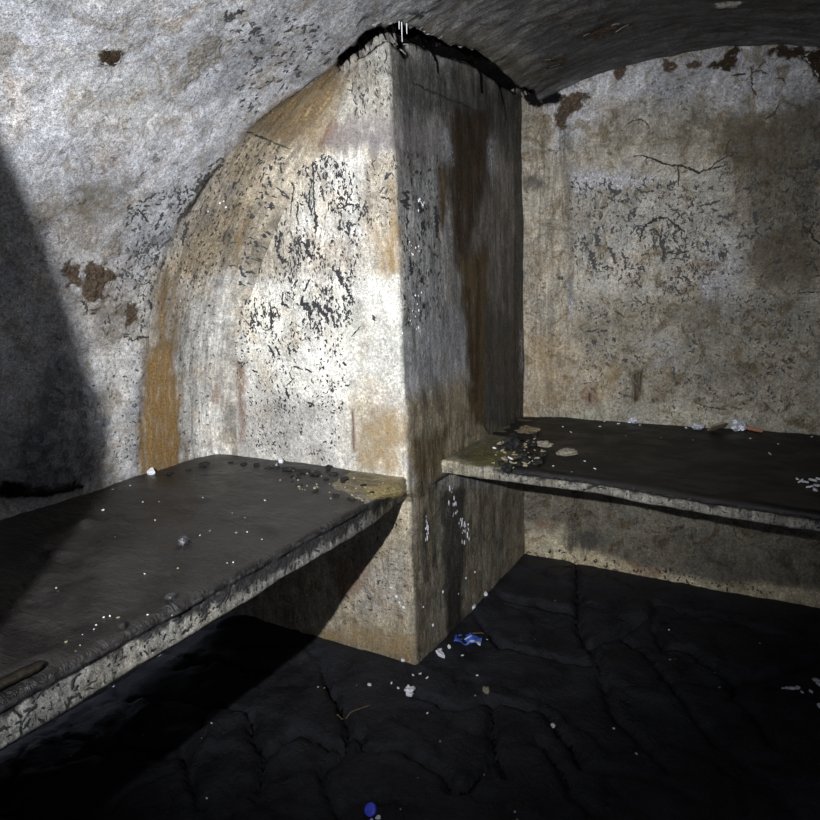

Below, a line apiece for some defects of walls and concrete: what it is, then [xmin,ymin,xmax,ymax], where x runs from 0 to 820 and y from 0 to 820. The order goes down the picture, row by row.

spalling [98,48,123,66]
spalling [223,9,591,130]
spalling [768,45,820,82]
efflorescence [570,170,653,194]
crack [633,139,734,185]
spalling [60,137,441,457]
damp [470,94,542,435]
rust [138,276,180,472]